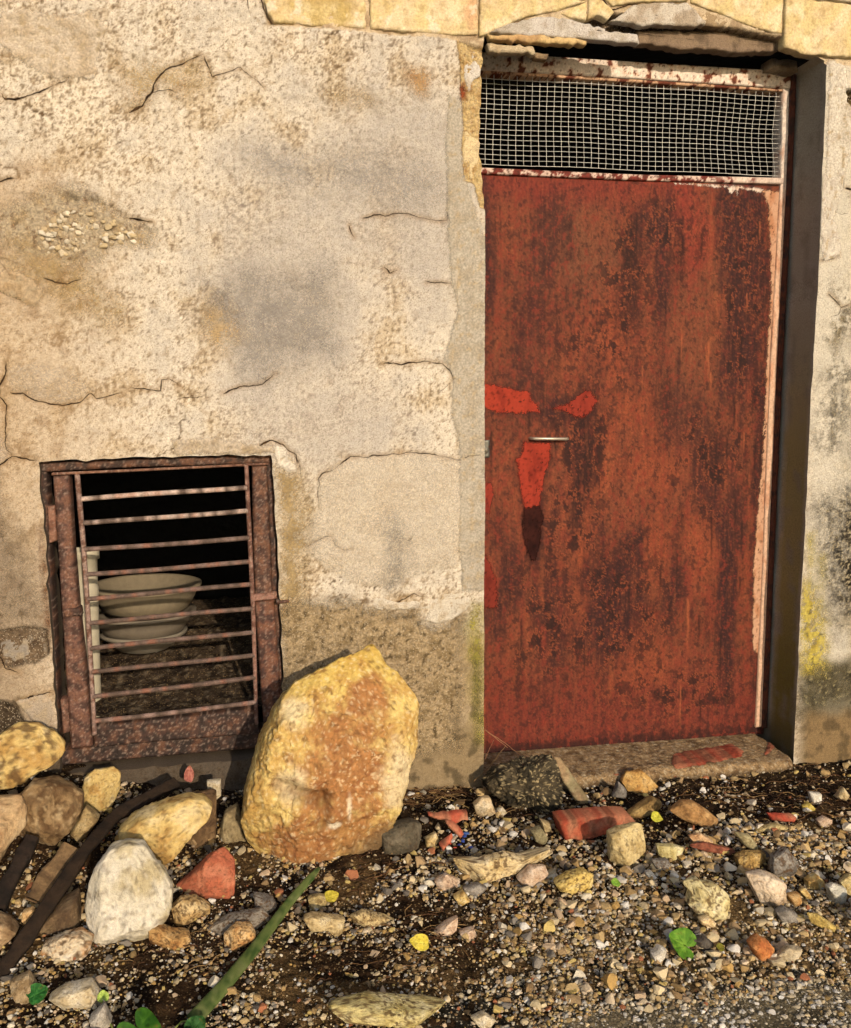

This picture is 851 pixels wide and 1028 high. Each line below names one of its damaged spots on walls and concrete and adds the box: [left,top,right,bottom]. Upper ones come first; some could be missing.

crack [1,81,65,100]
crack [129,56,263,113]
crack [349,199,448,237]
crack [383,361,454,401]
spalling [280,2,798,755]
crack [0,364,273,465]
rust [521,505,544,561]